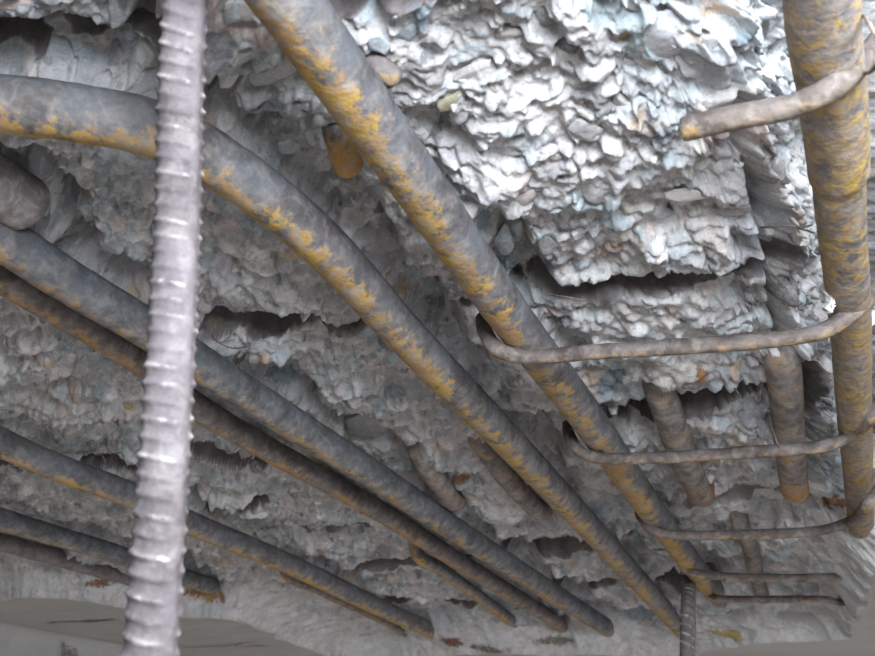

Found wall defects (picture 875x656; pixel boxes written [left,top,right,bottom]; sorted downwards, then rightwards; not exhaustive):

spalling [0,0,209,656]
spalling [180,0,875,656]
corrosion [451,474,470,485]
corrosion [815,496,846,512]
corrosion [184,589,225,604]